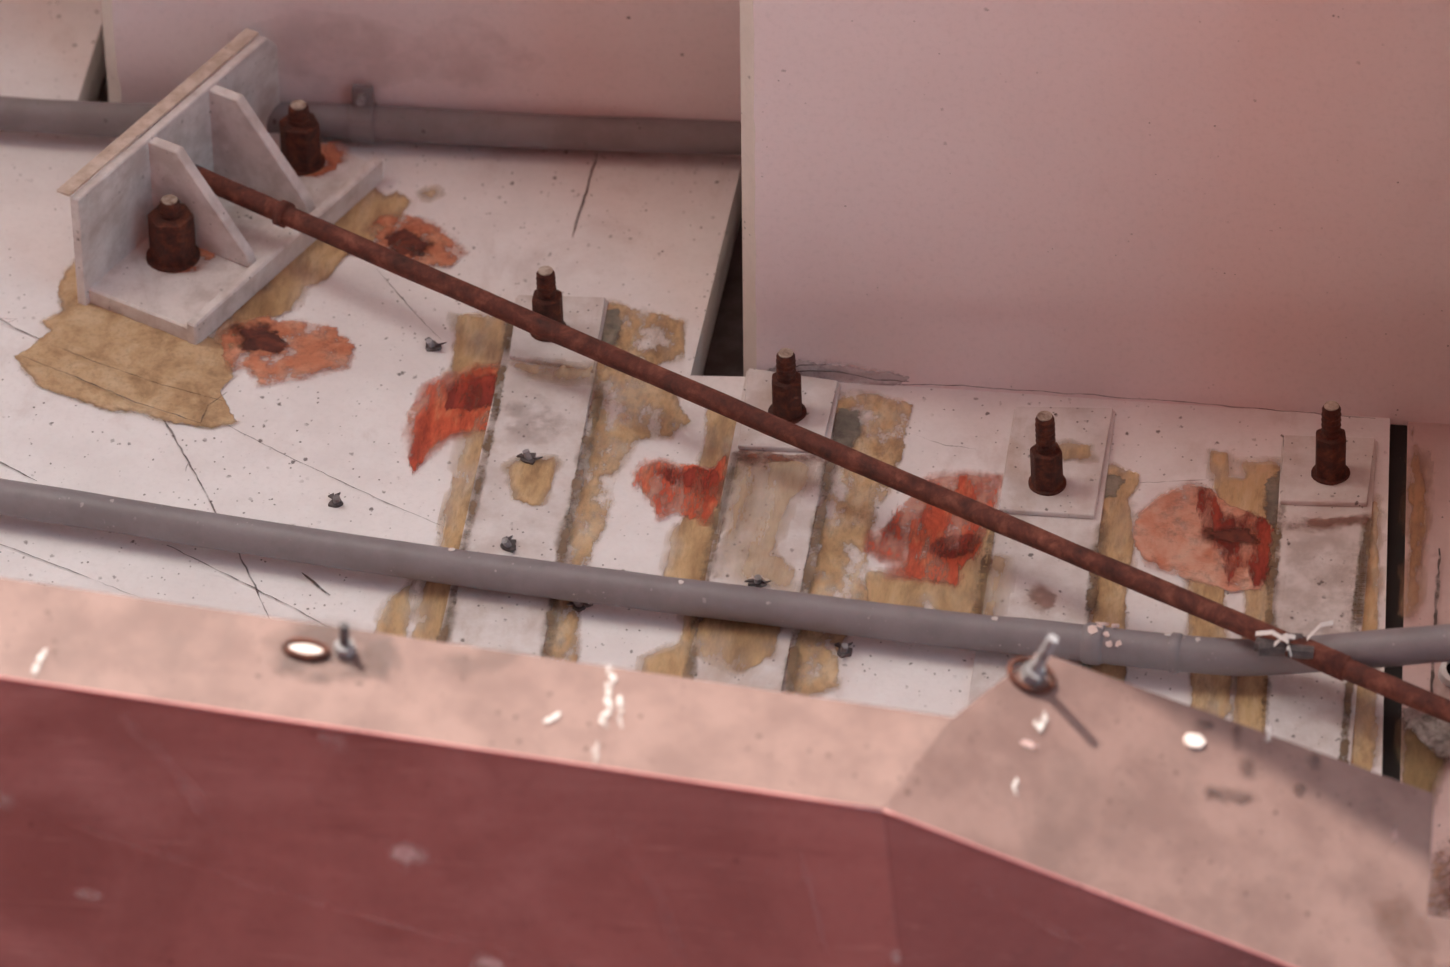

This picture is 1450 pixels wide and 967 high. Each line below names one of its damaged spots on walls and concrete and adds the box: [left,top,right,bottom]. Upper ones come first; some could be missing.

rust [373,214,462,266]
rust [220,316,355,385]
peeling [795,360,909,386]
crack [1,319,430,521]
rust [408,366,499,473]
rust [632,456,726,524]
rust [743,452,816,462]
rust [930,474,1000,507]
rust [867,497,986,586]
rust [1133,484,1274,592]
crack [167,545,330,625]
peeling [1184,733,1205,749]